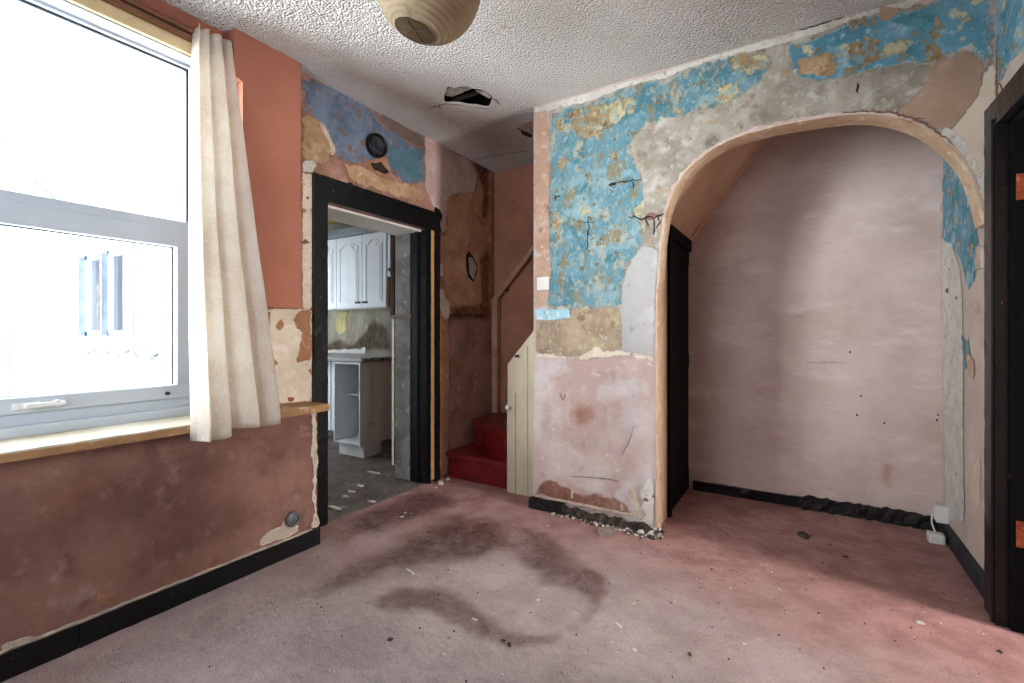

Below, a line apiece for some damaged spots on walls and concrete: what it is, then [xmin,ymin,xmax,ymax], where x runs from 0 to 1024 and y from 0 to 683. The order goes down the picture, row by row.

spalling [444,87,493,106]
peeling [301,77,426,202]
crack [609,179,642,189]
peeling [517,0,1024,321]
crack [629,212,663,235]
peeling [268,160,320,528]
flaking render [536,346,654,361]
peeling [942,158,978,522]
flaking render [640,477,655,528]